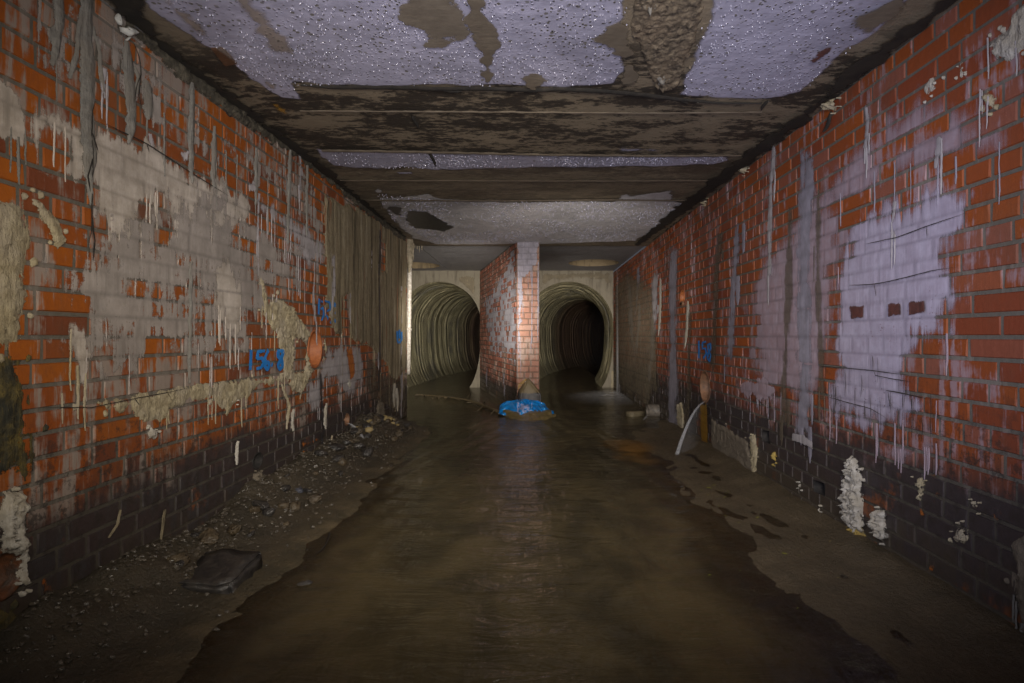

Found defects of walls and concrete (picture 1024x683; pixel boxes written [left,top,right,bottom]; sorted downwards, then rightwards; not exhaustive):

damp [0,0,406,444]
spalling [388,207,453,232]
damp [484,0,1024,546]
damp [0,486,33,597]